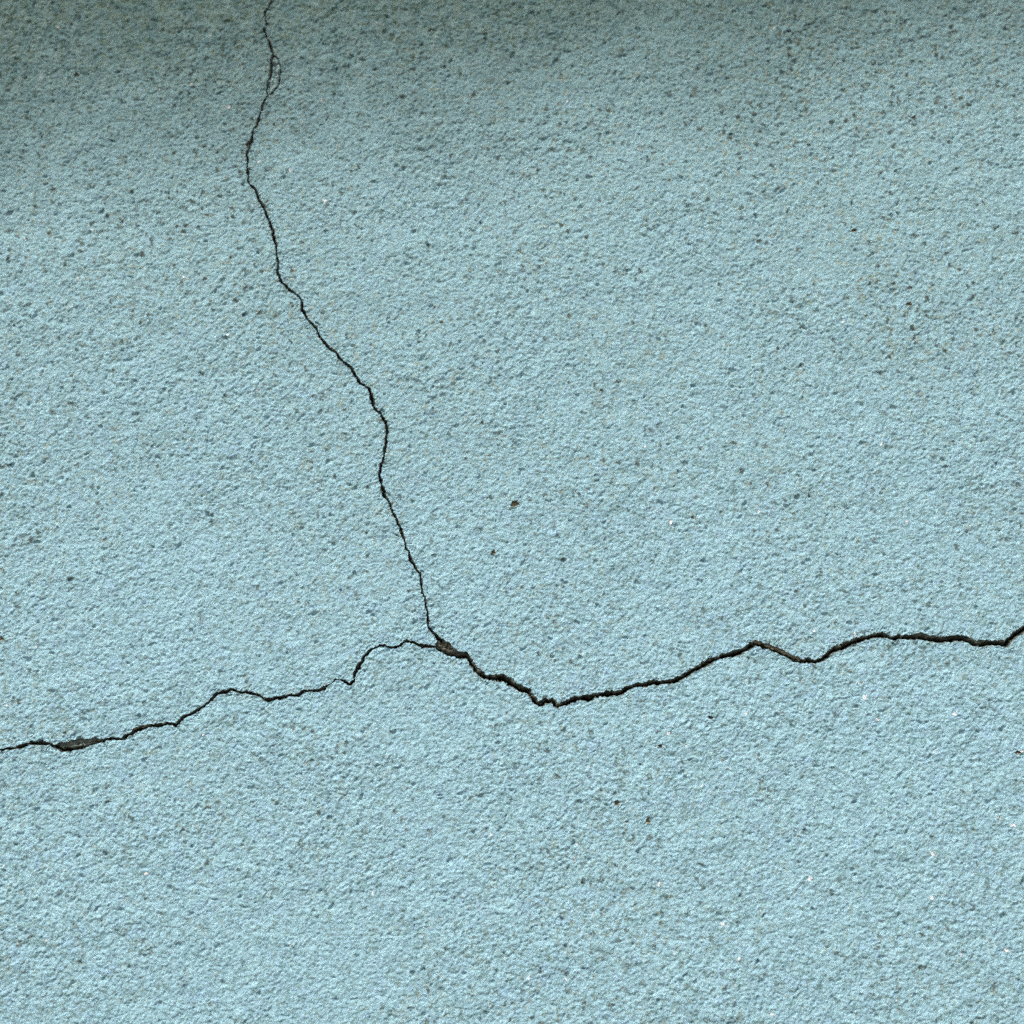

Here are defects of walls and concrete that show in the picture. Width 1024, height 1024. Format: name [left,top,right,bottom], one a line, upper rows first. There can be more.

crack [0,0,1024,752]